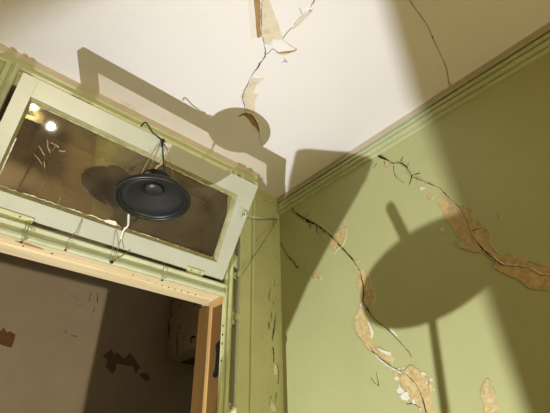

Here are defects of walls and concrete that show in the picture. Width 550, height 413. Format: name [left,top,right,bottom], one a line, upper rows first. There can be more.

peeling [248,0,297,56]
peeling [238,76,264,134]
crack [241,0,286,146]
peeling [0,327,16,348]
crack [280,243,300,269]
peeling [330,226,348,253]
crack [291,207,411,356]
peeling [353,259,394,364]
crack [374,154,550,276]
peeling [413,175,550,292]
crack [370,348,427,413]
peeling [393,364,435,413]